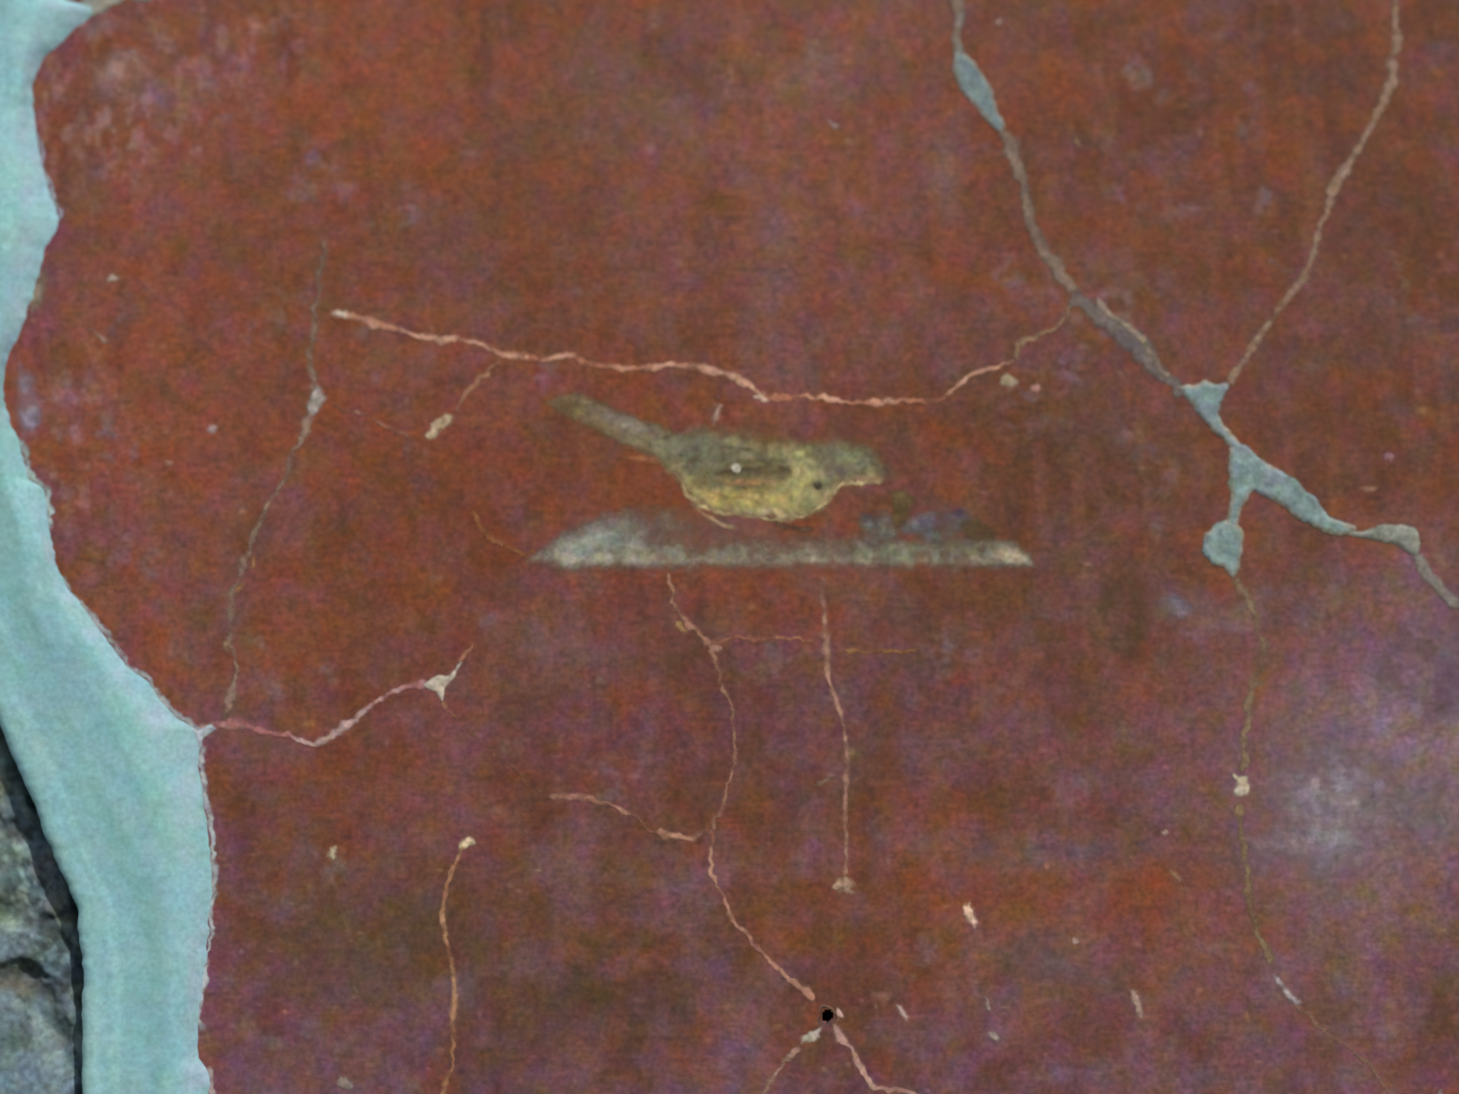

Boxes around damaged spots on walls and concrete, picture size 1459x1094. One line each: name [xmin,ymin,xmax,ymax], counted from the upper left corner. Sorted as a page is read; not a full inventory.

crack [80,0,122,16]
crack [193,241,474,748]
crack [334,0,1459,1094]